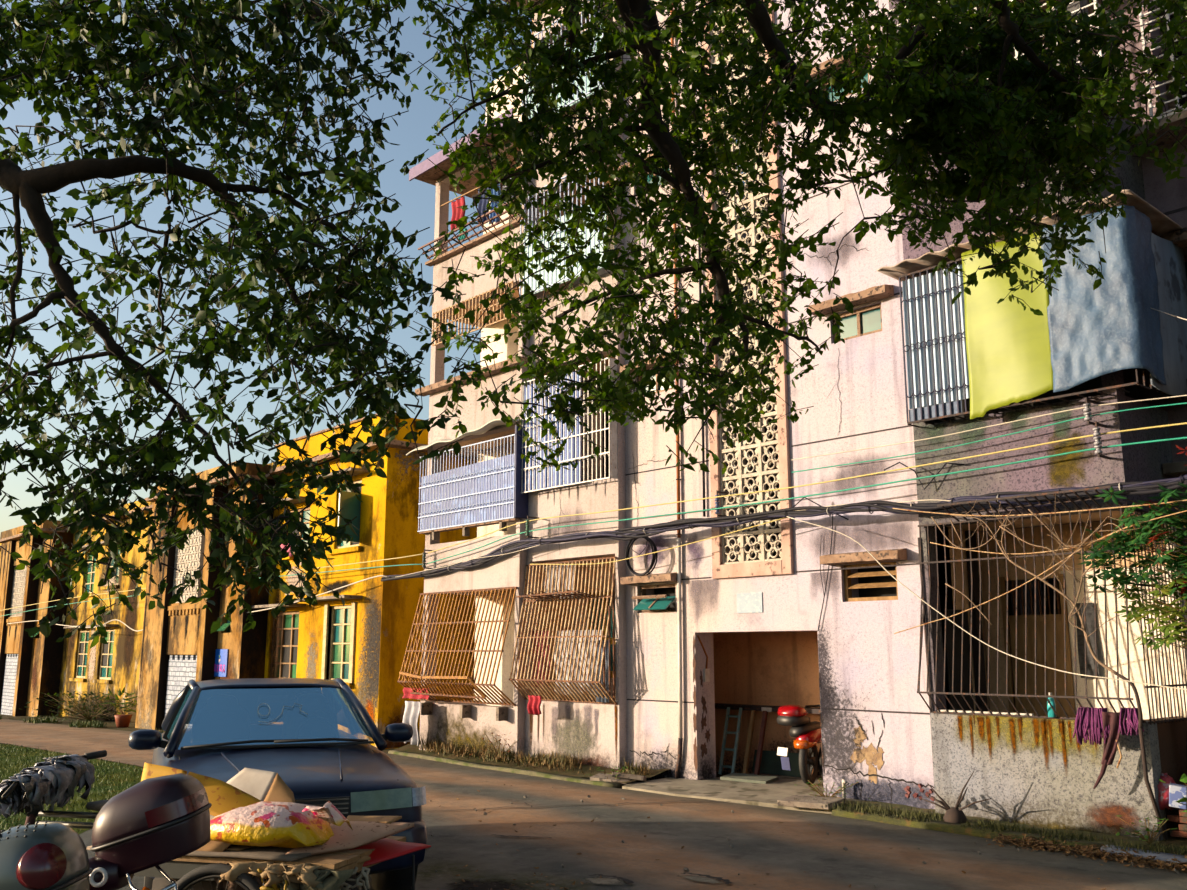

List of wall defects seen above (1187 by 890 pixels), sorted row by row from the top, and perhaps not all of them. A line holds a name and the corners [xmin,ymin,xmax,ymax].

leakage [770,626,932,808]
peeling [850,724,884,784]
corrosion [957,716,1080,767]